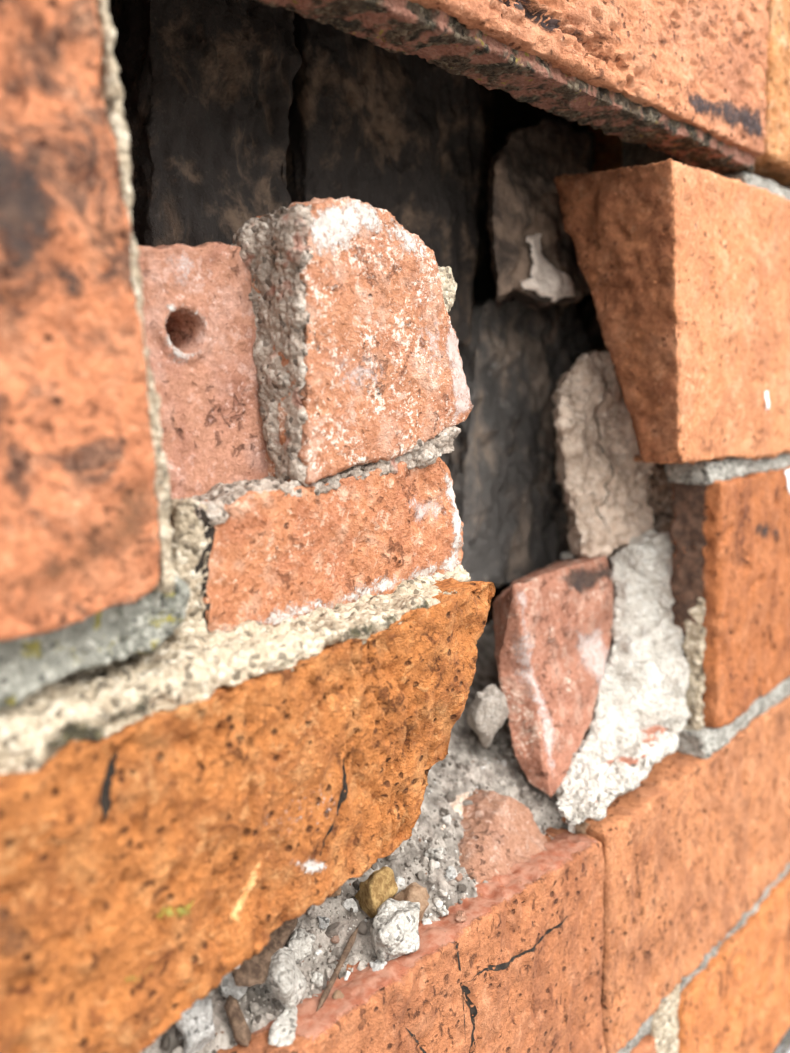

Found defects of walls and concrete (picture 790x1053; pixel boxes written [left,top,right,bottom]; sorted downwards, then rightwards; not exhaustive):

peeling [521,233,575,303]
spalling [231,197,474,487]
spalling [604,725,670,766]
spalling [0,578,496,1053]
spalling [295,788,596,1042]
crack [404,1026,427,1053]
crack [452,916,568,1053]